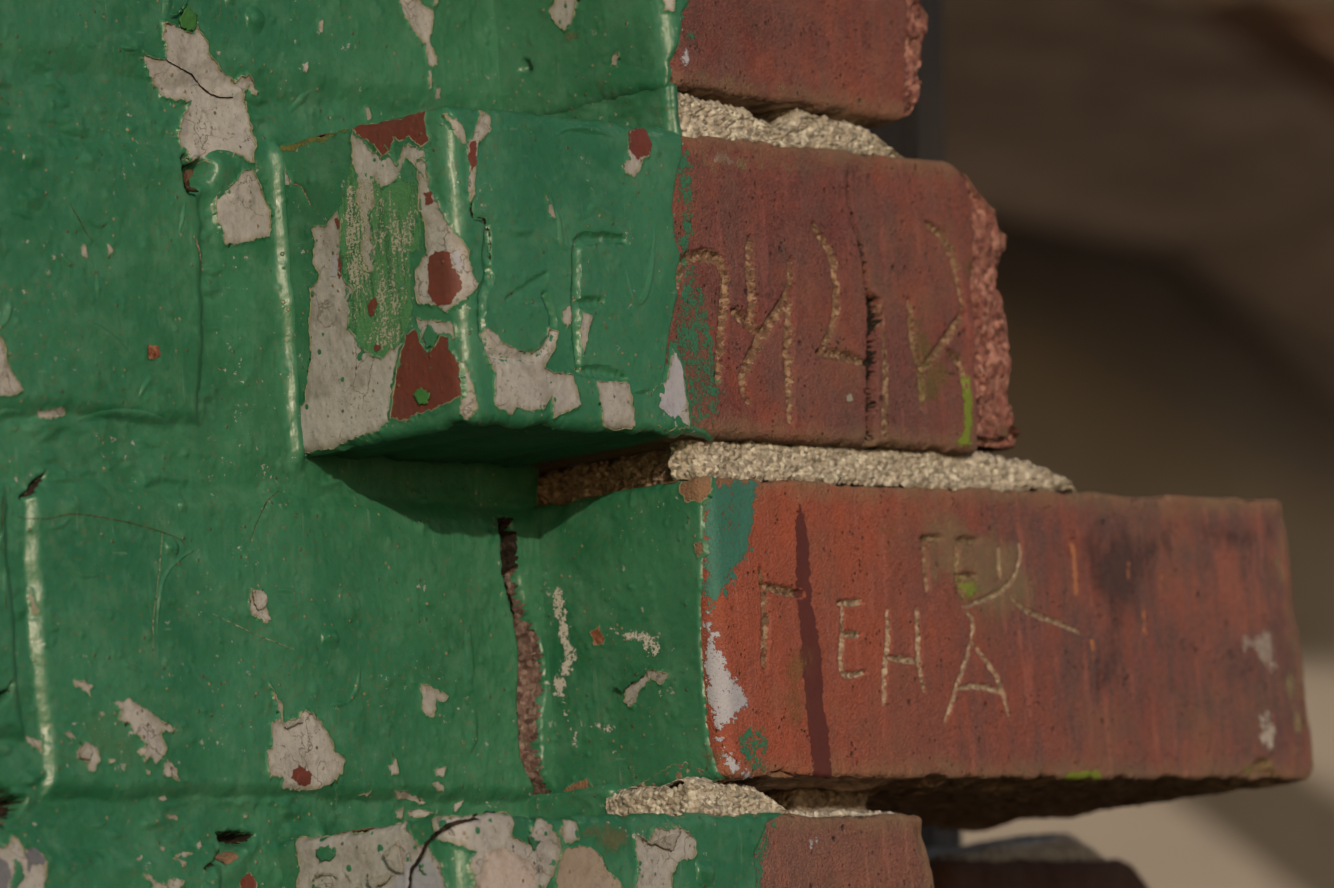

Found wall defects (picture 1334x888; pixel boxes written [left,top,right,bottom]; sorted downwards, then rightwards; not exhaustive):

peeling [659,0,679,18]
peeling [139,0,275,249]
peeling [620,127,652,180]
peeling [300,0,637,457]
peeling [0,333,26,401]
peeling [33,403,68,423]
peeling [652,344,692,432]
peeling [71,676,184,824]
peeling [264,680,347,796]
crack [408,817,478,888]
peeling [294,755,699,888]